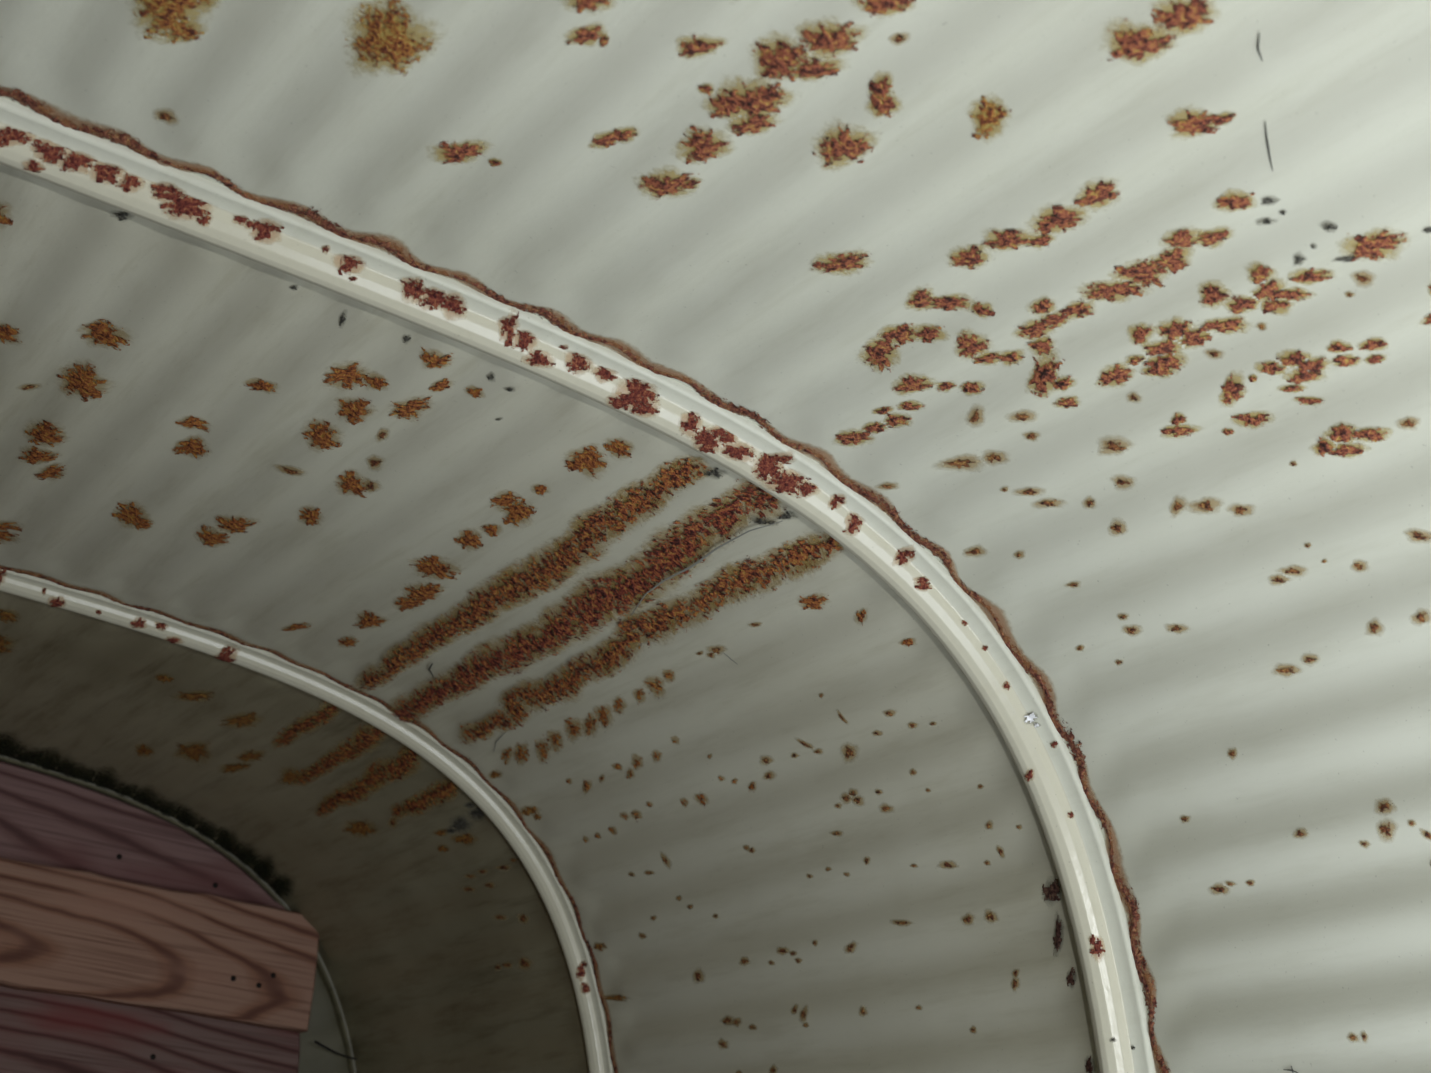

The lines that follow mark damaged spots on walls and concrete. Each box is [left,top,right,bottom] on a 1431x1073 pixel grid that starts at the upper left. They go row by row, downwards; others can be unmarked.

corrosion [133,0,217,44]
corrosion [344,0,434,76]
corrosion [566,0,610,47]
corrosion [638,0,916,200]
corrosion [1216,191,1255,212]
corrosion [1345,230,1407,297]
corrosion [1313,418,1418,457]
corrosion [1171,498,1252,515]
corrosion [1407,531,1431,541]
corrosion [1271,566,1305,584]
corrosion [1276,655,1318,676]
corrosion [1360,800,1431,848]